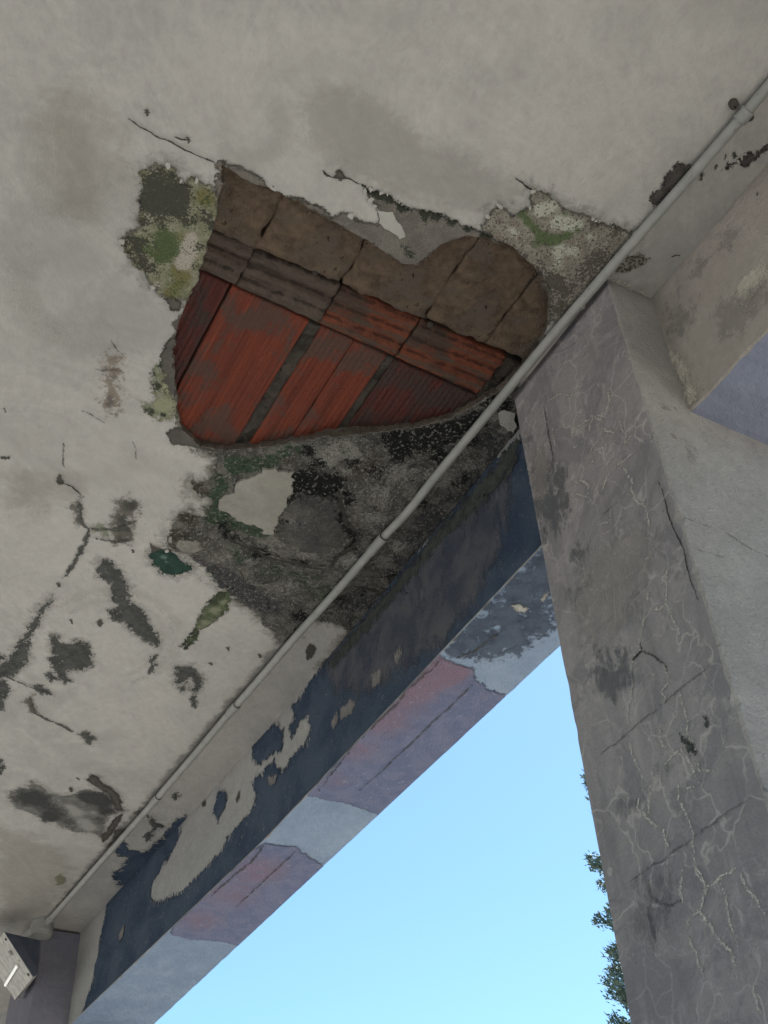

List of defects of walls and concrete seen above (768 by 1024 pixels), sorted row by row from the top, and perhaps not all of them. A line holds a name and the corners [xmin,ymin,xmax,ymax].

crack [128,109,214,163]
flaking render [160,159,651,451]
water stain [108,498,141,547]
crack [536,388,699,600]
water stain [0,599,96,745]
water stain [93,558,162,674]
water stain [171,665,204,709]
peeling [82,434,541,1012]
water stain [8,775,125,848]
crack [626,644,766,1012]